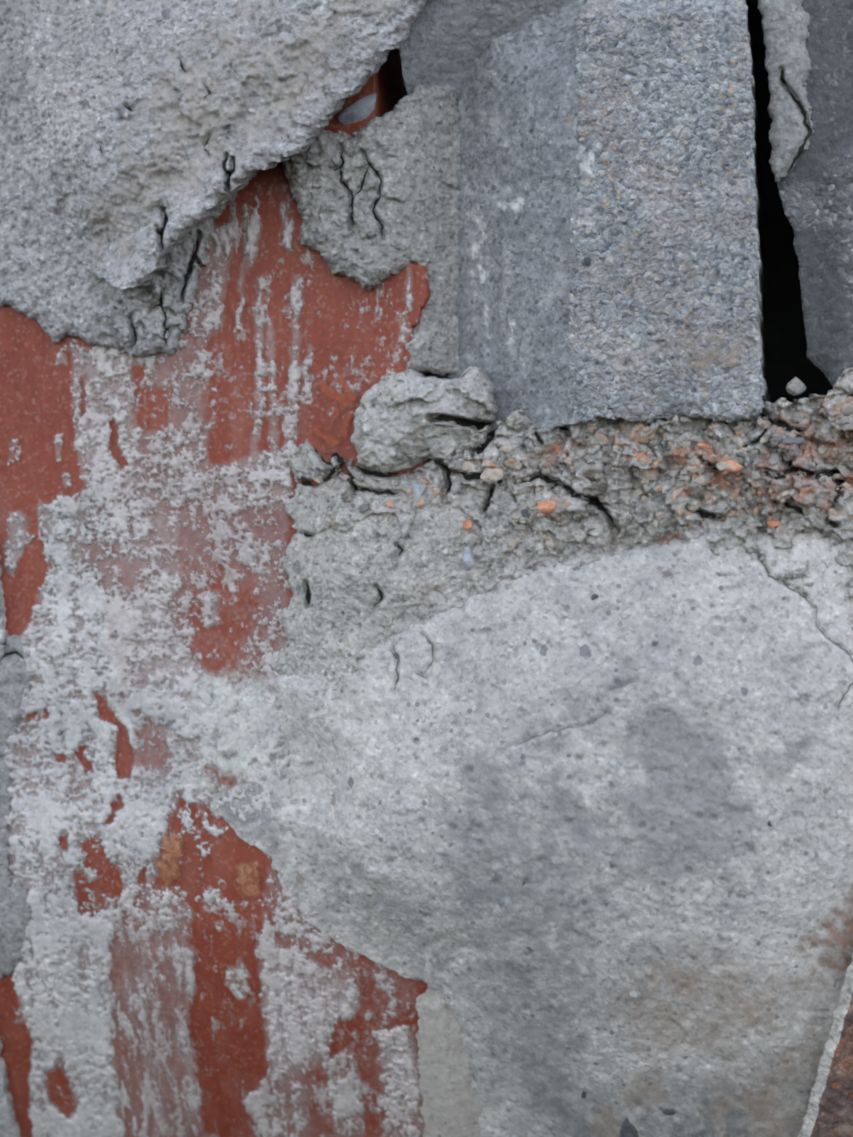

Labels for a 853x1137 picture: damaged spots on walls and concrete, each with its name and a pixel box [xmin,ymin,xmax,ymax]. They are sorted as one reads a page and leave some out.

crack [156,212,168,249]
crack [204,136,235,189]
crack [334,151,383,238]
crack [780,69,813,176]
crack [131,234,202,348]
spalling [538,501,557,515]
spalling [725,460,742,472]
peeling [2,474,294,1137]
corrosion [813,912,853,971]
peeling [218,856,424,1137]